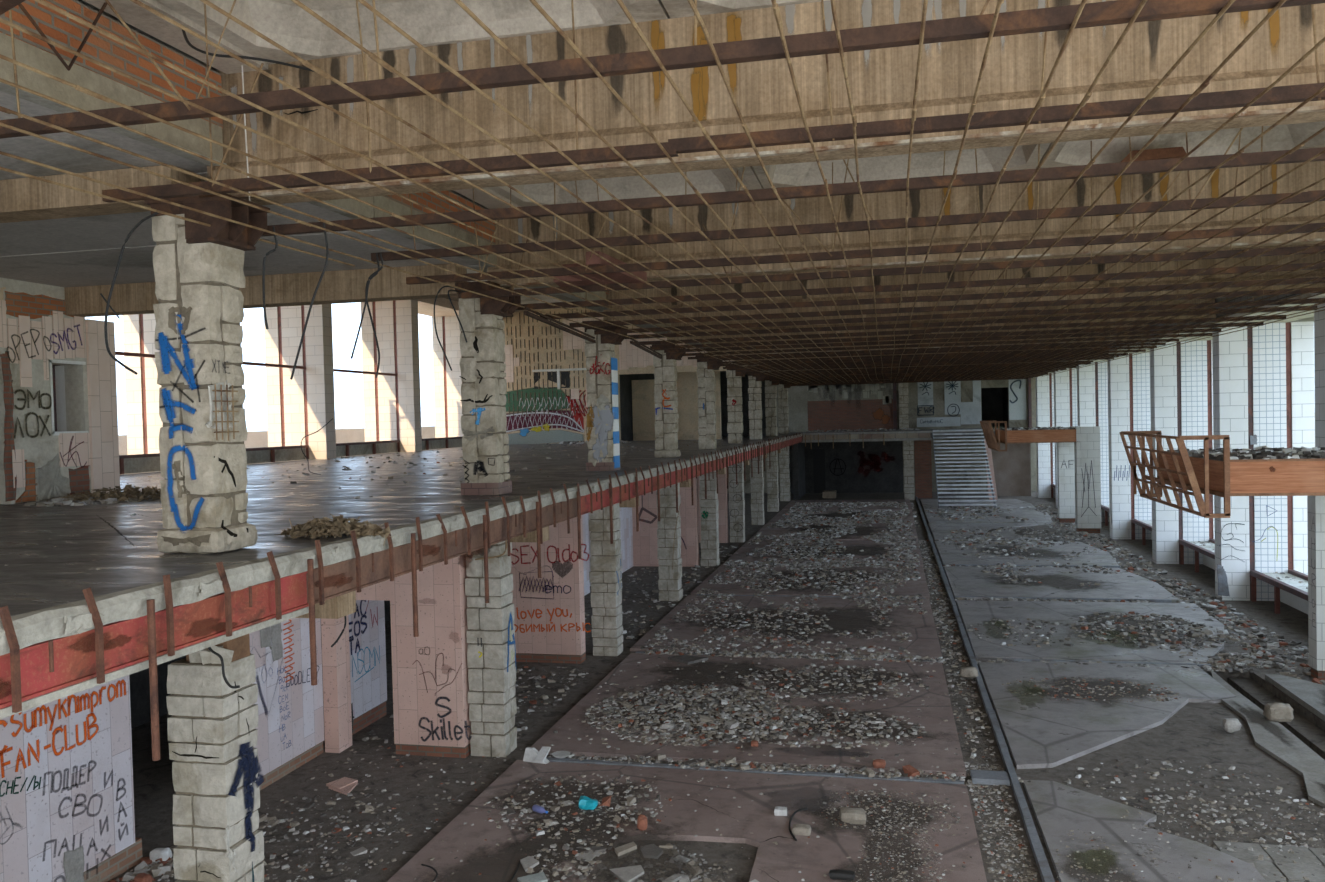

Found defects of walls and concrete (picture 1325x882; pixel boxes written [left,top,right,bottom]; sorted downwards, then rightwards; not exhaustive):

leakage [1301,5,1312,25]
leakage [1149,20,1161,58]
flaking render [5,291,74,319]
crack [214,456,236,487]
crack [221,520,249,537]
rust [458,549,482,568]
rust [315,573,352,588]
rust [187,618,237,637]
rust [70,633,131,652]
crack [172,737,218,759]